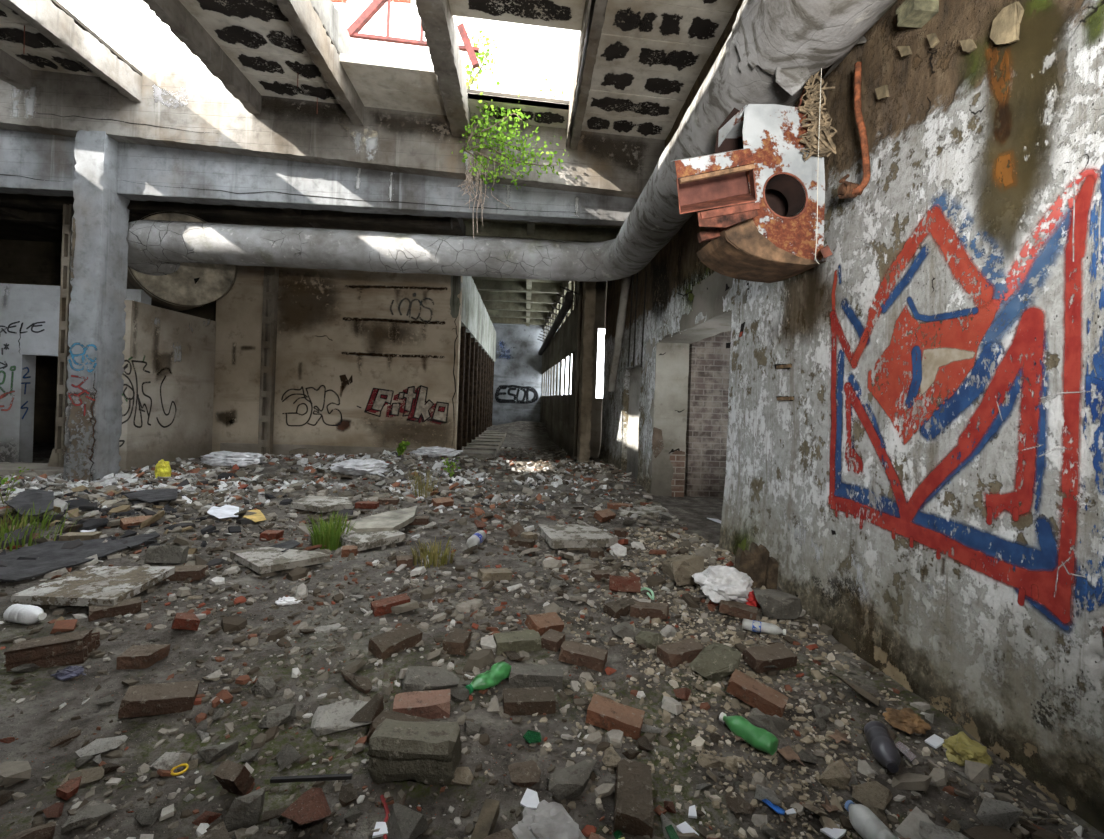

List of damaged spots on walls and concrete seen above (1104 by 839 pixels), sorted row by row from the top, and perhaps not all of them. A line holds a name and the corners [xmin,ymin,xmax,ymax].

flaking render [990,1,1024,45]
flaking render [897,46,912,57]
flaking render [927,33,940,48]
flaking render [960,39,977,52]
flaking render [1055,49,1068,86]
flaking render [875,85,889,100]
damp [968,0,1062,258]